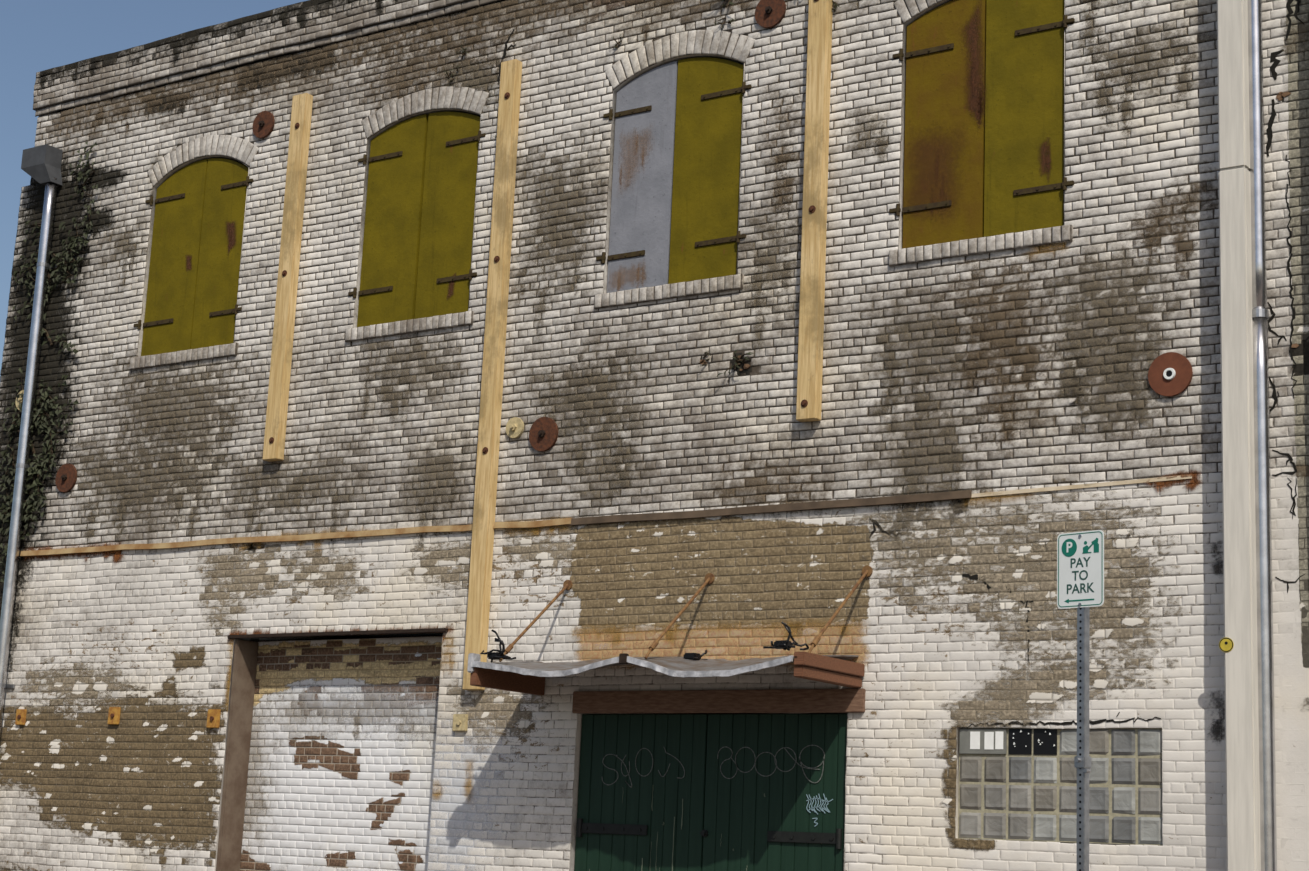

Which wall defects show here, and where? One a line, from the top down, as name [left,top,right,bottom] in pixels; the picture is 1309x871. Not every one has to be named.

corrosion [964,9,984,119]
damp [1078,0,1214,148]
crack [1266,0,1304,414]
damp [0,0,611,672]
damp [529,343,648,508]
damp [868,183,1217,549]
corrosion [1148,471,1201,492]
crack [1272,450,1297,519]
peeling [0,646,228,867]
peeling [289,736,361,780]
peeling [253,639,550,753]
peeling [503,478,1183,851]